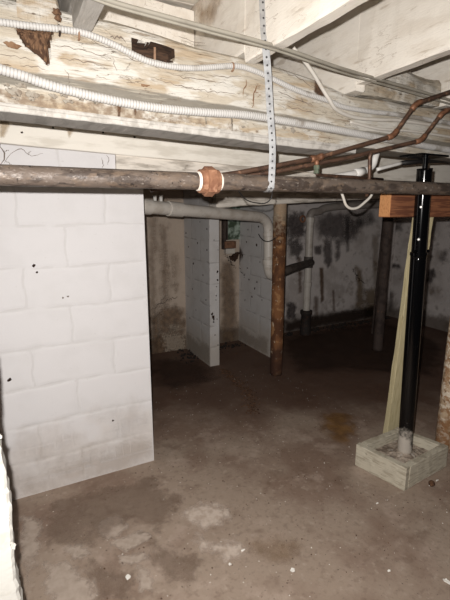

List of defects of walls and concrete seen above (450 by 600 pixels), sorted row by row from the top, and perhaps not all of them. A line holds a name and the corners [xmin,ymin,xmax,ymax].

peeling [3,33,35,50]
crack [55,35,140,82]
crack [153,67,260,107]
water stain [287,212,306,258]
water stain [315,214,362,266]
water stain [152,307,185,354]